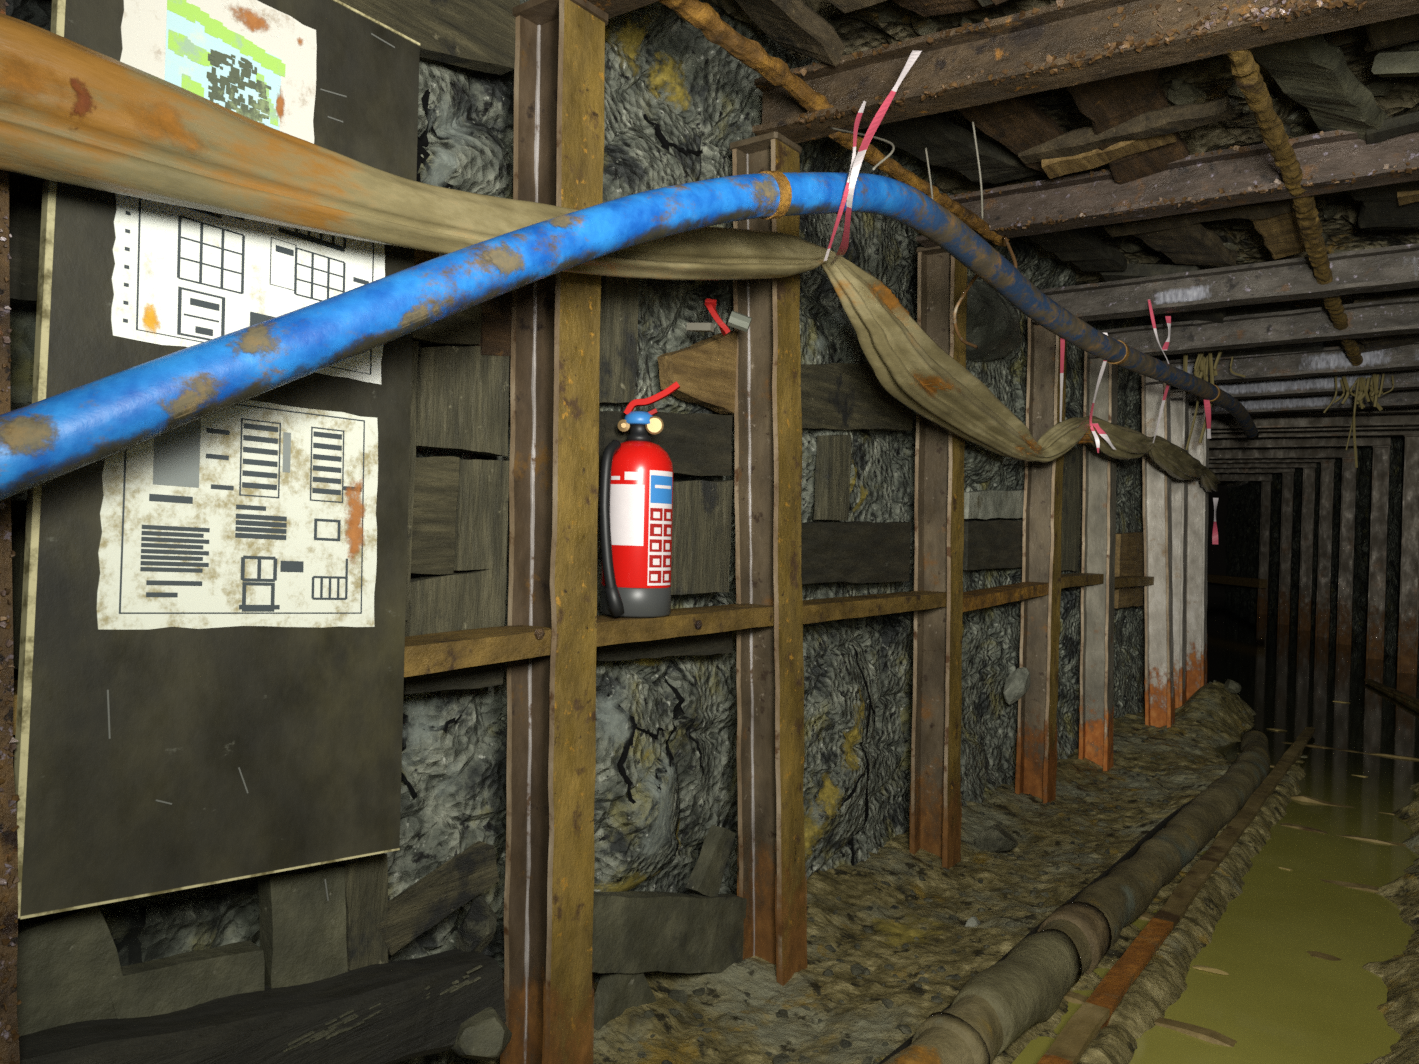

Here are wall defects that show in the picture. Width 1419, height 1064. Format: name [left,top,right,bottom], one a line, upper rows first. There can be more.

rust [70,78,95,116]
rust [276,94,284,118]
rust [0,571,14,705]
rust [1144,643,1207,728]
rust [1079,707,1114,771]